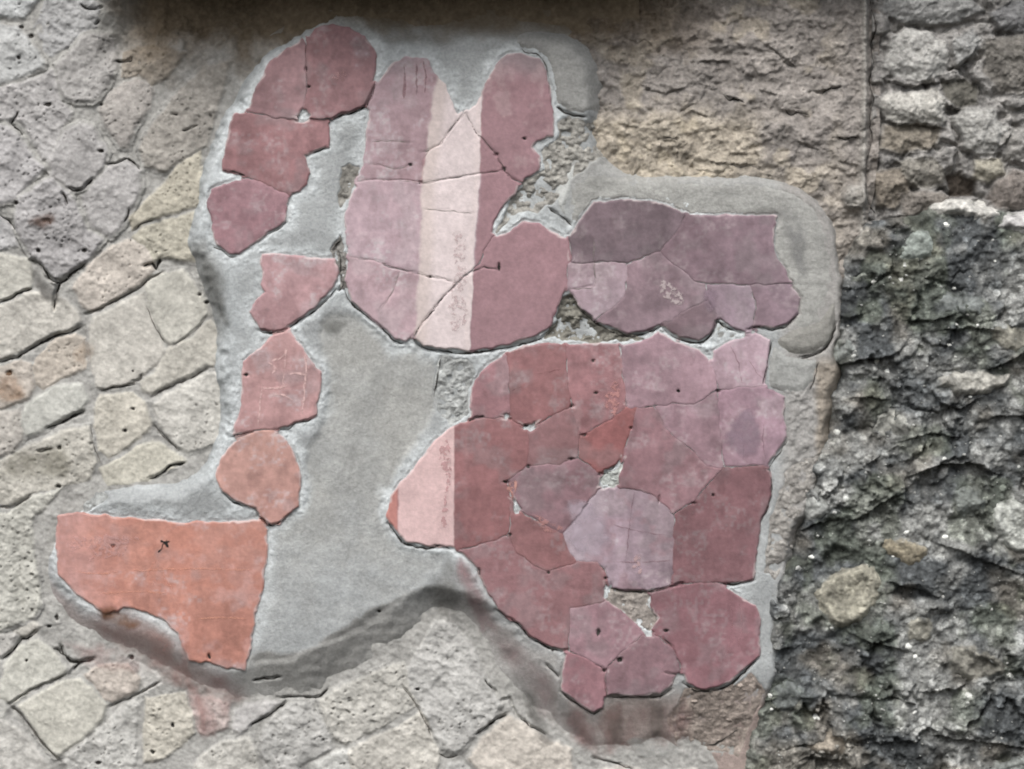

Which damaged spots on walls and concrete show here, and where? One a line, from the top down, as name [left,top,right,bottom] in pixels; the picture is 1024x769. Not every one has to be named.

crack [364,112,505,183]
spalling [496,116,604,233]
crack [838,0,877,214]
crack [259,241,551,393]